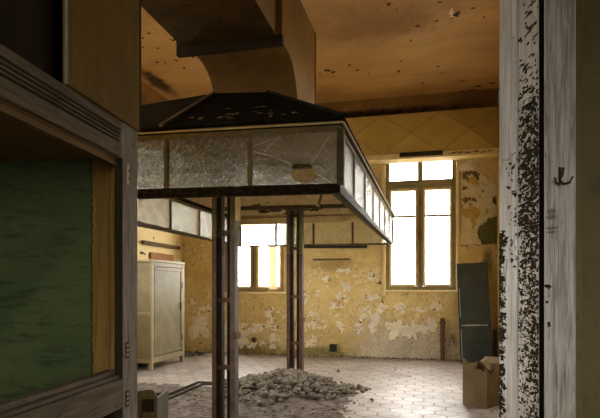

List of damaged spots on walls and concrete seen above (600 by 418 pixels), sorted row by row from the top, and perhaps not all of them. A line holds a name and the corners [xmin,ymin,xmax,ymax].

peeling [518,0,539,45]
spalling [448,150,497,245]
peeling [499,53,552,418]
peeling [188,298,212,344]
peeling [238,307,287,351]
peeling [304,288,327,349]
peeling [315,268,382,333]
peeling [354,293,443,344]